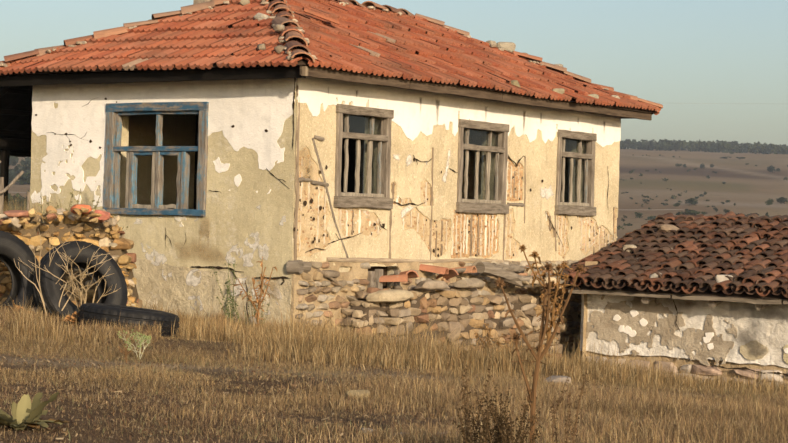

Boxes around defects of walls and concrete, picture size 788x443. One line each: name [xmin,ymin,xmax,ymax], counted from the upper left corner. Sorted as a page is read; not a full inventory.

peeling [30,131,106,215]
peeling [113,99,620,330]
flaking render [586,295,768,366]